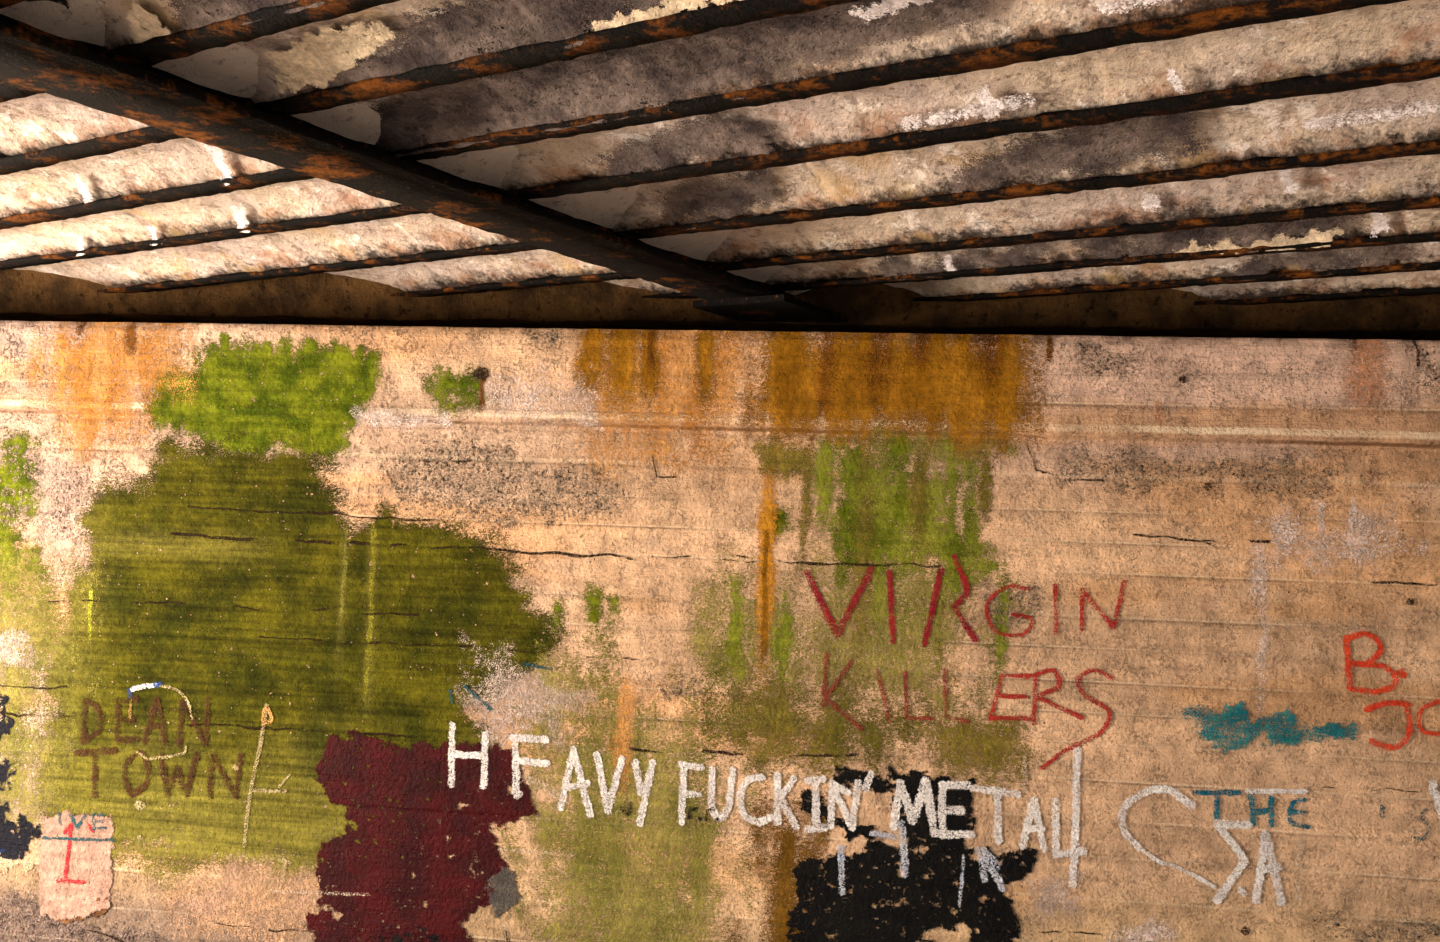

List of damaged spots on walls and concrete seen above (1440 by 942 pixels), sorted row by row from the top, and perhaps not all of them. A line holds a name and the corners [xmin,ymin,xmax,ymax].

rust [24,321,199,474]
water stain [218,331,231,364]
water stain [257,340,275,387]
water stain [300,337,453,448]
water stain [339,527,348,625]
water stain [363,523,377,698]
rust [546,329,1053,689]
water stain [795,427,1014,693]
water stain [154,856,344,942]
water stain [1106,917,1183,942]